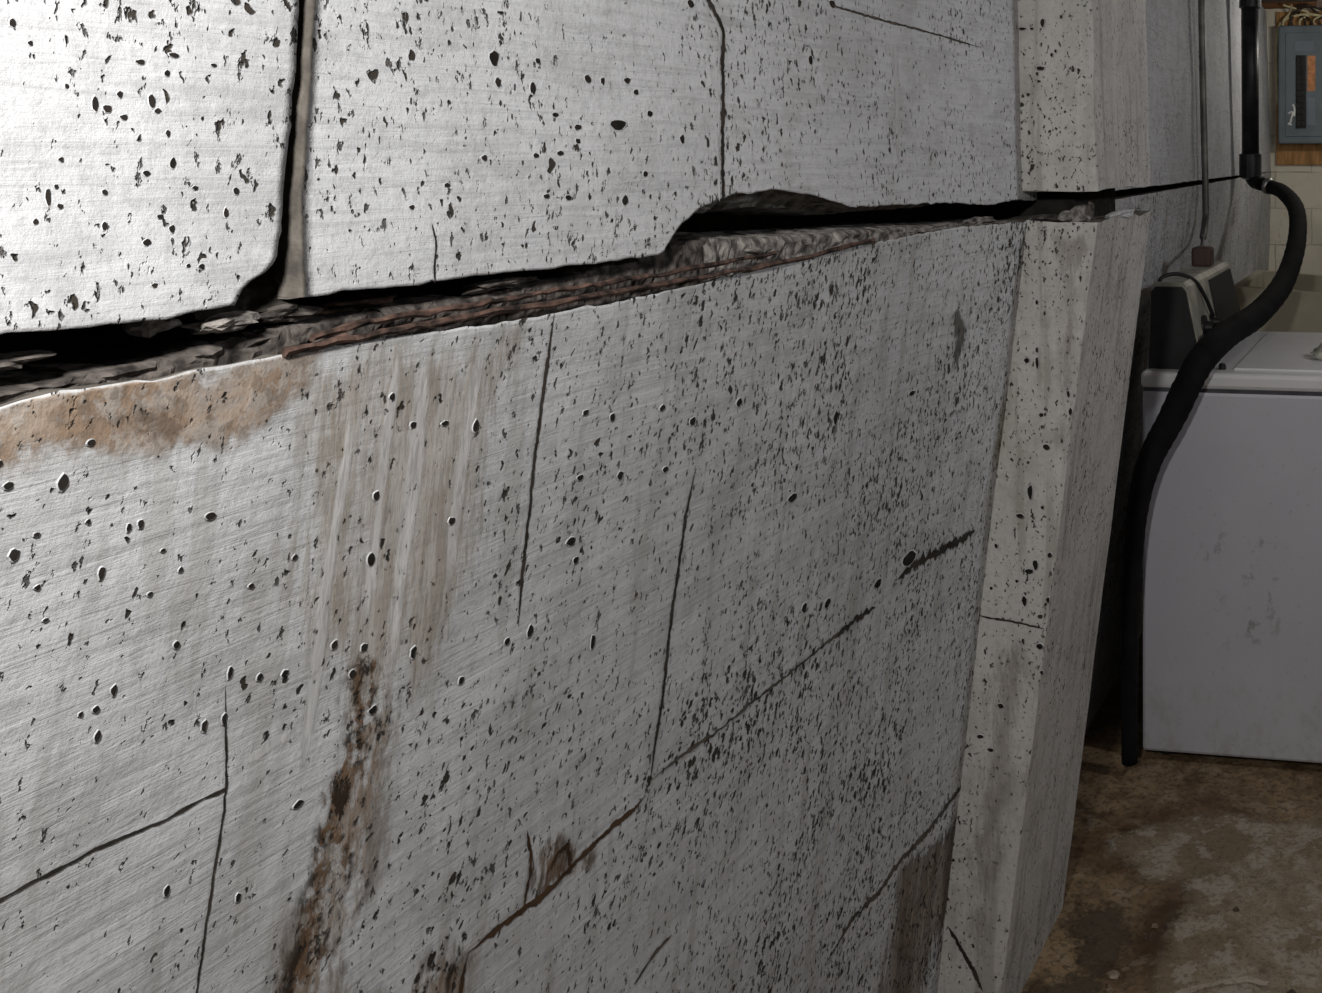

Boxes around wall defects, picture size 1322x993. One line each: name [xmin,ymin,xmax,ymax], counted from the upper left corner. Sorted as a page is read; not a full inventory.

crack [0,0,1238,625]
crack [0,691,228,993]
crack [459,472,875,993]
crack [807,786,961,993]
crack [948,927,983,991]
leakage [1109,813,1322,993]